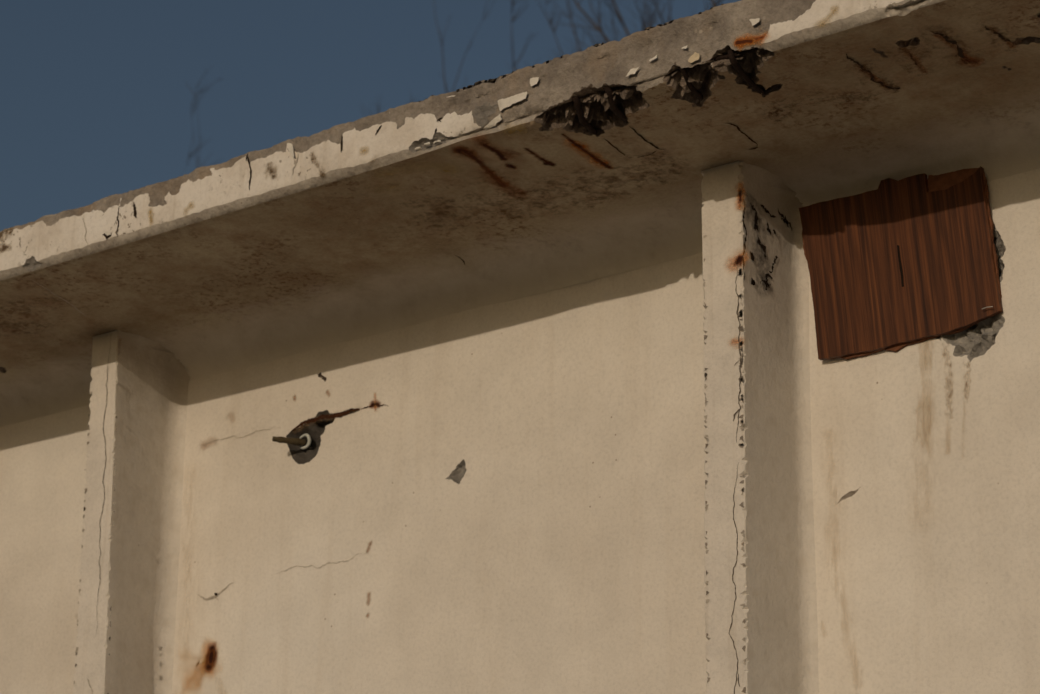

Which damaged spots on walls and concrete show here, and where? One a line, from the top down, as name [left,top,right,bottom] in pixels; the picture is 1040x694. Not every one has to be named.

spalling [885,0,932,17]
spalling [1012,36,1040,45]
peeling [15,0,816,230]
rust [454,138,557,208]
peeling [738,196,792,290]
spalling [993,224,1006,282]
spalling [925,314,1005,362]
spalling [286,408,360,464]
spalling [446,459,466,484]
crack [729,265,741,694]
crack [199,583,231,600]
rust [199,644,217,672]